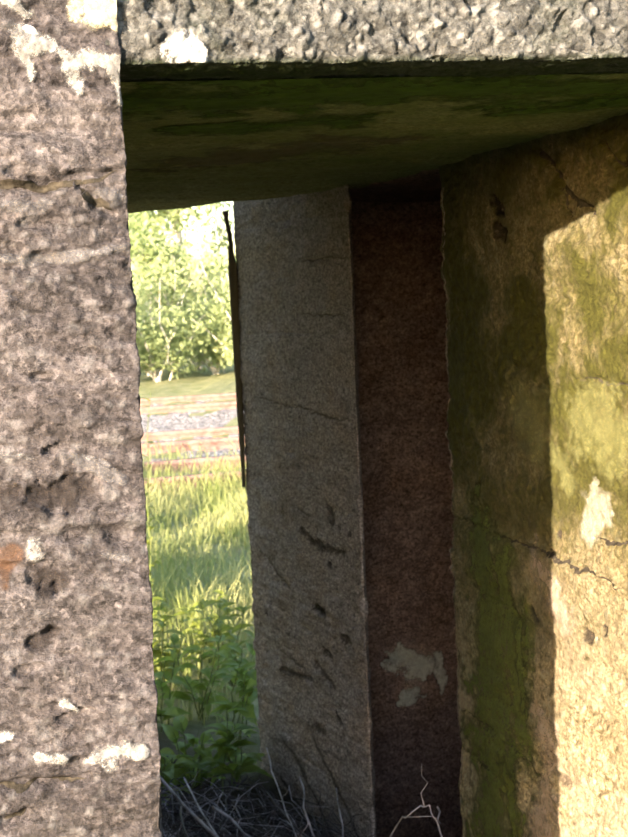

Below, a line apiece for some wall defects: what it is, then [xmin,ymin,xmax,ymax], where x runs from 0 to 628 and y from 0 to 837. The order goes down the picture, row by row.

damp [0,0,122,106]
crack [456,516,619,590]
crack [595,537,628,546]